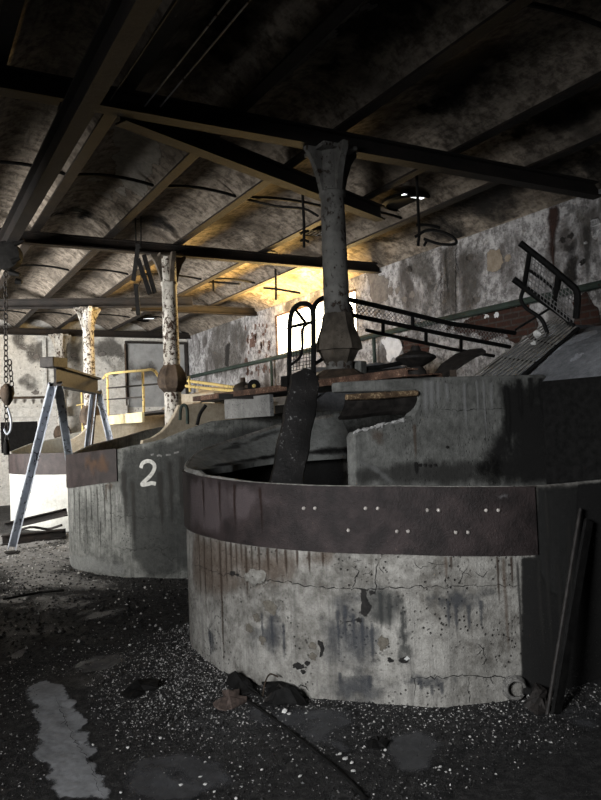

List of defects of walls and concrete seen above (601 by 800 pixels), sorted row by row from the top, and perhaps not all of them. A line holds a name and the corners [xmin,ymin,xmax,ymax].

spalling [353,418,406,434]
leakage [359,378,601,697]
crack [265,560,517,594]
spalling [356,589,375,623]
leakage [261,614,285,652]
leakage [330,590,409,658]
leakage [339,673,376,697]